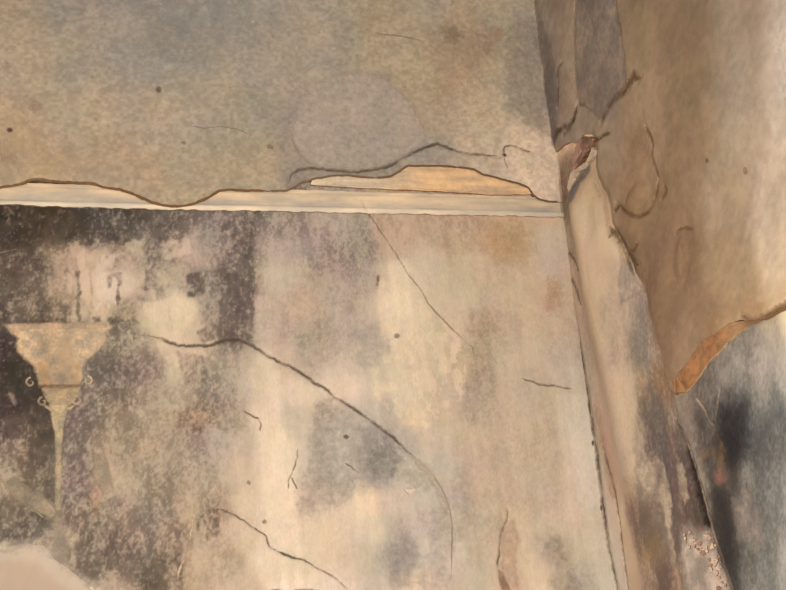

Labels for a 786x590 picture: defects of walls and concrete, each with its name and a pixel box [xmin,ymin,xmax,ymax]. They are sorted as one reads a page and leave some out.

flaking render [573,0,626,118]
crack [0,143,558,236]
flaking render [310,167,531,195]
flaking render [567,136,598,192]
crack [164,338,400,445]
flaking render [675,320,761,395]
flaking render [0,541,102,590]
crack [177,508,195,579]
crack [217,509,345,587]
crack [435,479,453,560]
water stain [712,492,734,574]